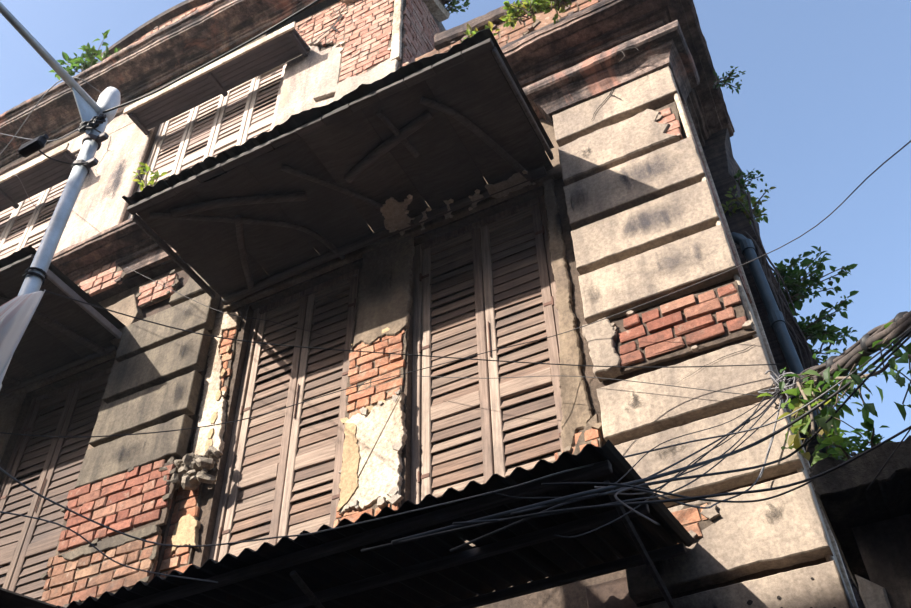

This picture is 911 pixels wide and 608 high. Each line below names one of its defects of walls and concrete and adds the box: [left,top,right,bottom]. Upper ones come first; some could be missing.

peeling [380,194,431,236]
leakage [633,211,667,229]
flaking render [610,96,757,374]
flaking render [192,311,241,456]
flaking render [333,327,408,528]
flaking render [551,413,602,463]
flaking render [40,459,203,607]
flaking render [672,502,720,539]